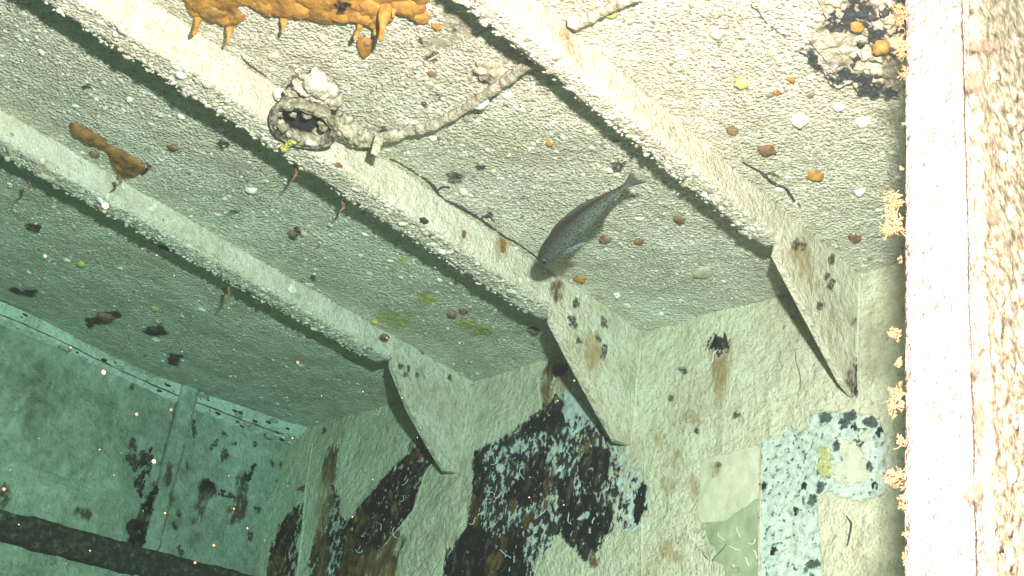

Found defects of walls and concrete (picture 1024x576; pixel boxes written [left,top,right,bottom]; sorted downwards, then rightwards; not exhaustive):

corrosion [184,0,430,59]
corrosion [69,122,152,178]
crack [389,158,538,259]
crack [742,161,801,207]
corrosion [705,332,730,404]
peeling [693,409,888,576]